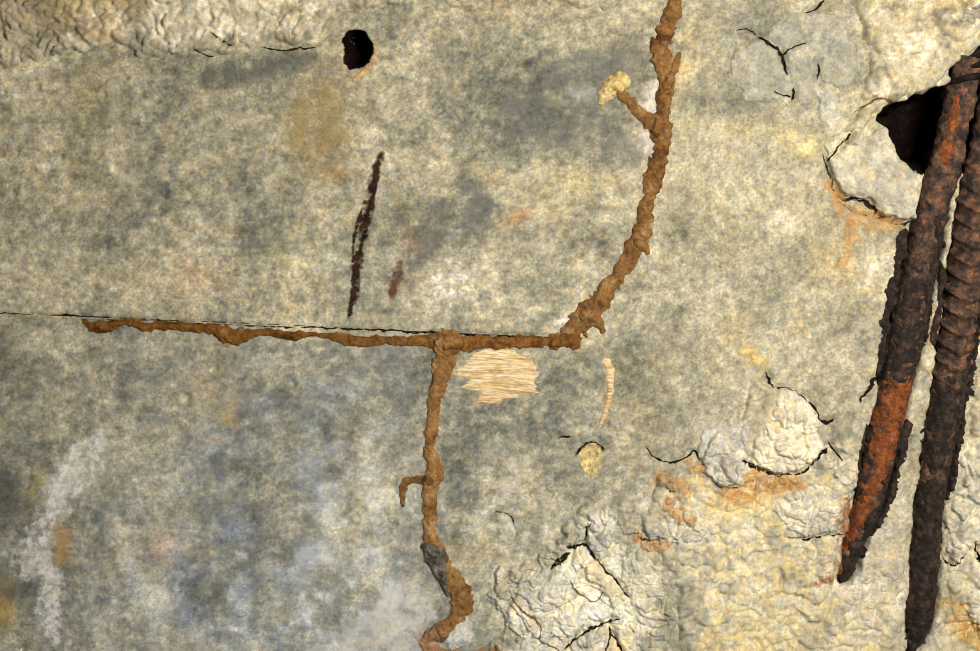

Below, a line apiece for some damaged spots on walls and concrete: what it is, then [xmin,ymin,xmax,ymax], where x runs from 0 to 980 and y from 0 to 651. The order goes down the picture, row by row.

spalling [0,0,402,70]
spalling [440,0,516,12]
crack [736,28,806,101]
rust [348,152,384,318]
rust [389,261,404,295]
crack [0,312,437,334]
crack [460,331,547,339]
spalling [482,0,980,651]
crack [645,446,700,464]
crack [715,371,843,489]
crack [510,522,629,651]